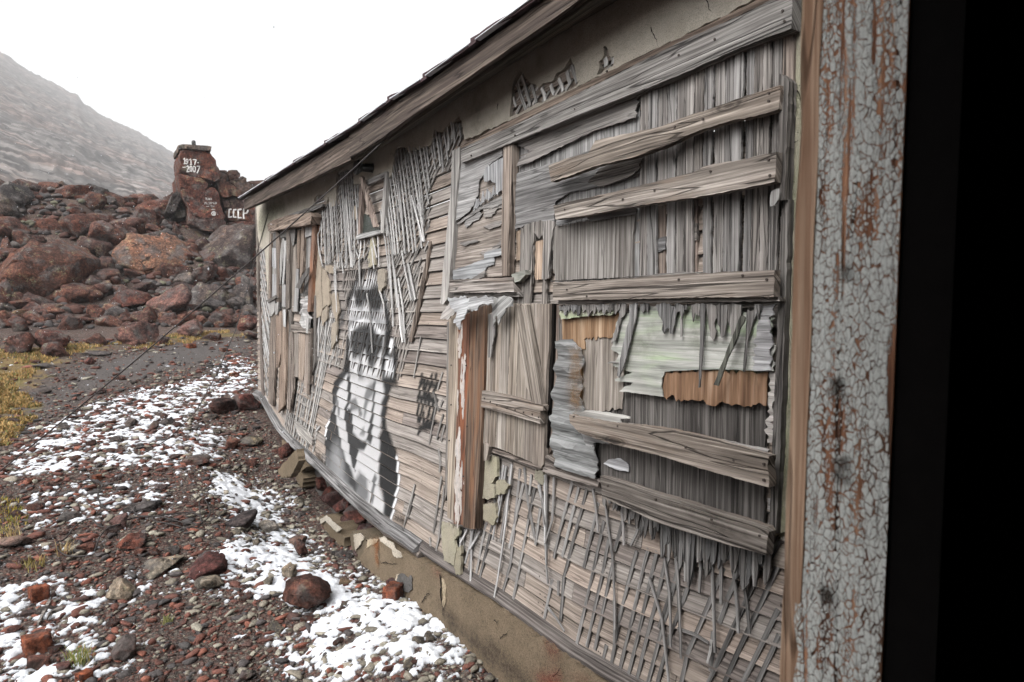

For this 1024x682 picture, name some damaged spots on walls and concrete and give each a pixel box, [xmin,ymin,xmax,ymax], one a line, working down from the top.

spalling [513,64,578,114]
spalling [284,121,503,452]
spalling [403,484,416,527]
spalling [428,295,782,682]
peeling [793,0,909,682]